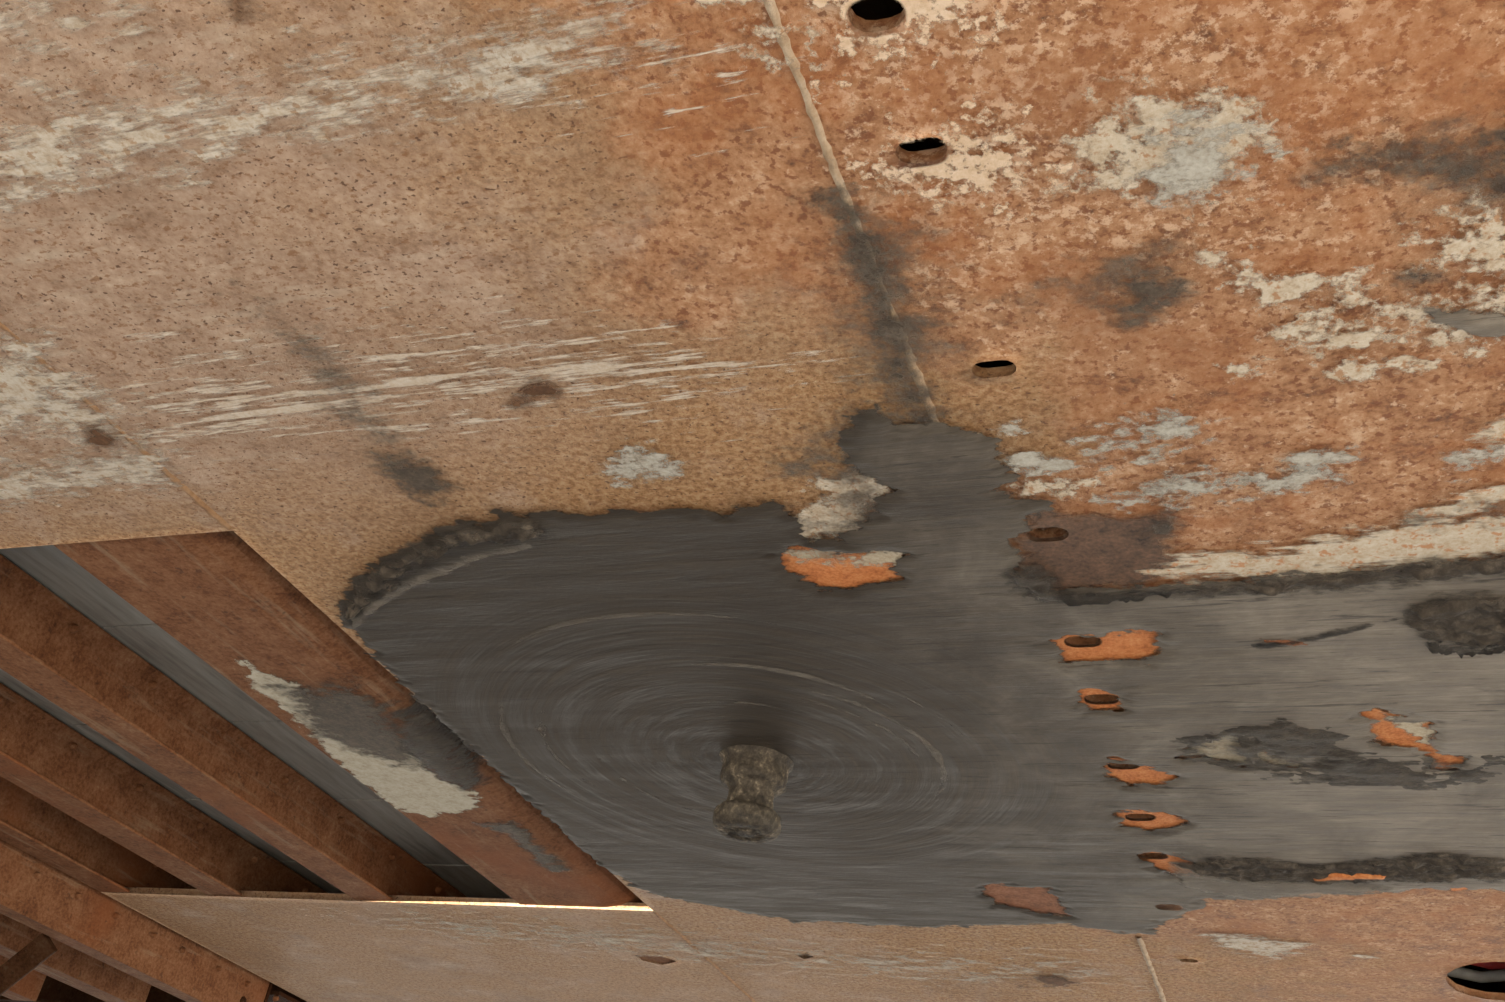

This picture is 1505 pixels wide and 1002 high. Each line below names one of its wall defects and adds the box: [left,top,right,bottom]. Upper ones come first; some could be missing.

damp [623,39,746,69]
damp [717,71,757,100]
peeling [1129,106,1293,208]
damp [1305,119,1505,206]
damp [508,381,562,409]
peeling [1281,446,1359,483]
rust [781,542,903,588]
rust [1049,629,1159,662]
damp [263,681,423,767]
rust [1360,708,1465,770]
rust [982,883,1071,916]